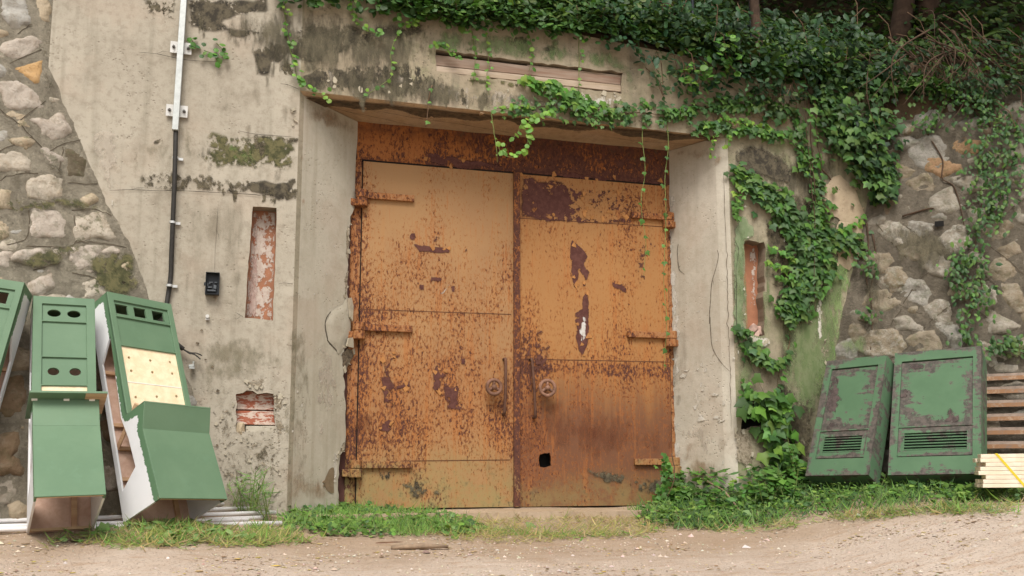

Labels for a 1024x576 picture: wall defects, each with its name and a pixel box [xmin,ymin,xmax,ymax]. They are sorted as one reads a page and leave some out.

water stain [189,0,488,111]
water stain [141,173,298,204]
water stain [254,135,298,156]
peeling [247,212,275,320]
rust [521,330,555,397]
crack [709,176,763,421]
peeling [743,236,770,346]
water stain [782,281,829,362]
spalling [214,393,294,496]